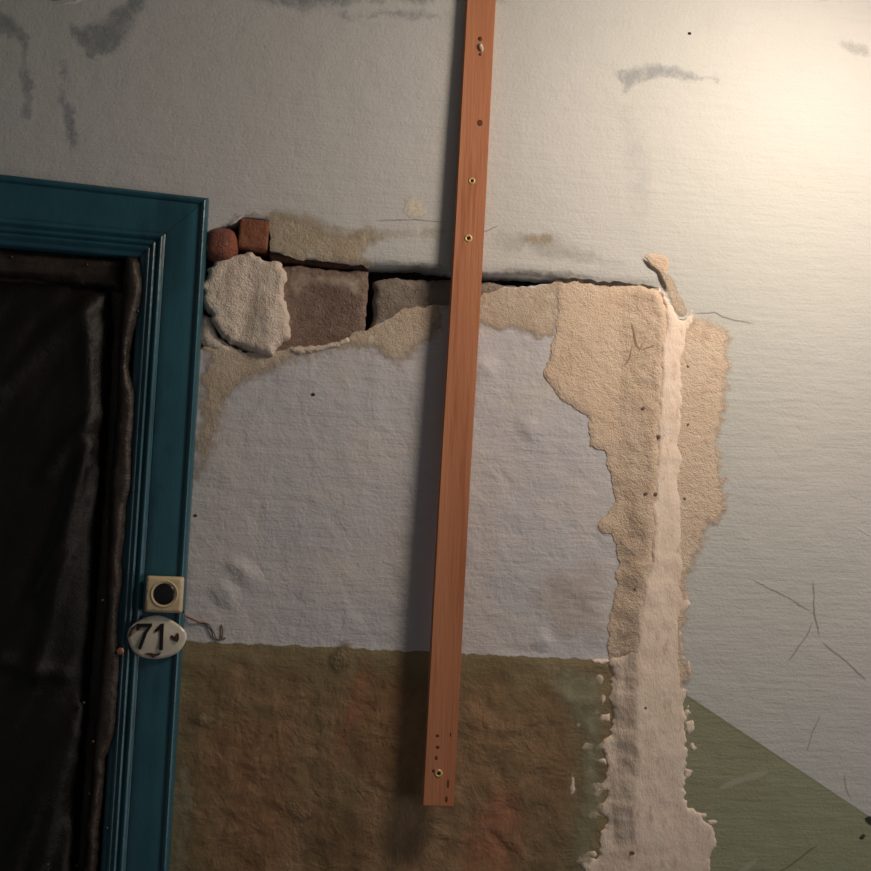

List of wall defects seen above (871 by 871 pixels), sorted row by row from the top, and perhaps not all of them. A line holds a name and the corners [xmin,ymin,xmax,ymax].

spalling [194,212,451,478]
peeling [479,254,732,659]
crack [552,278,661,289]